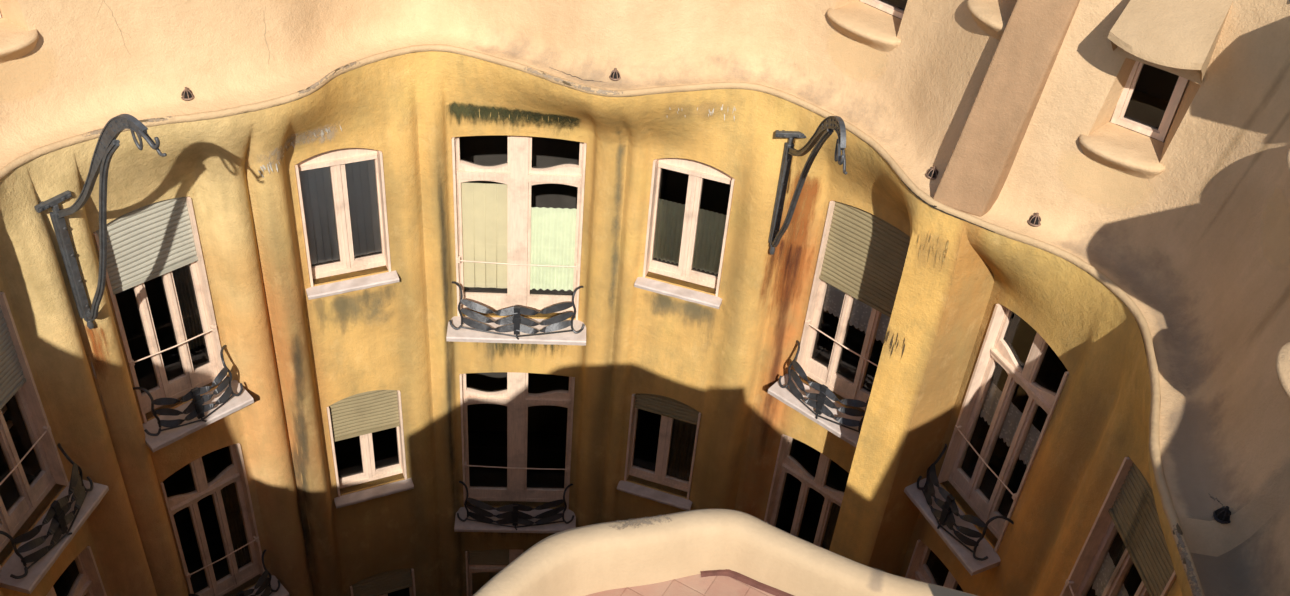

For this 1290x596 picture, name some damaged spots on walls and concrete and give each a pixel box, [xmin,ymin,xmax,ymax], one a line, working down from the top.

rust [762,177,818,311]